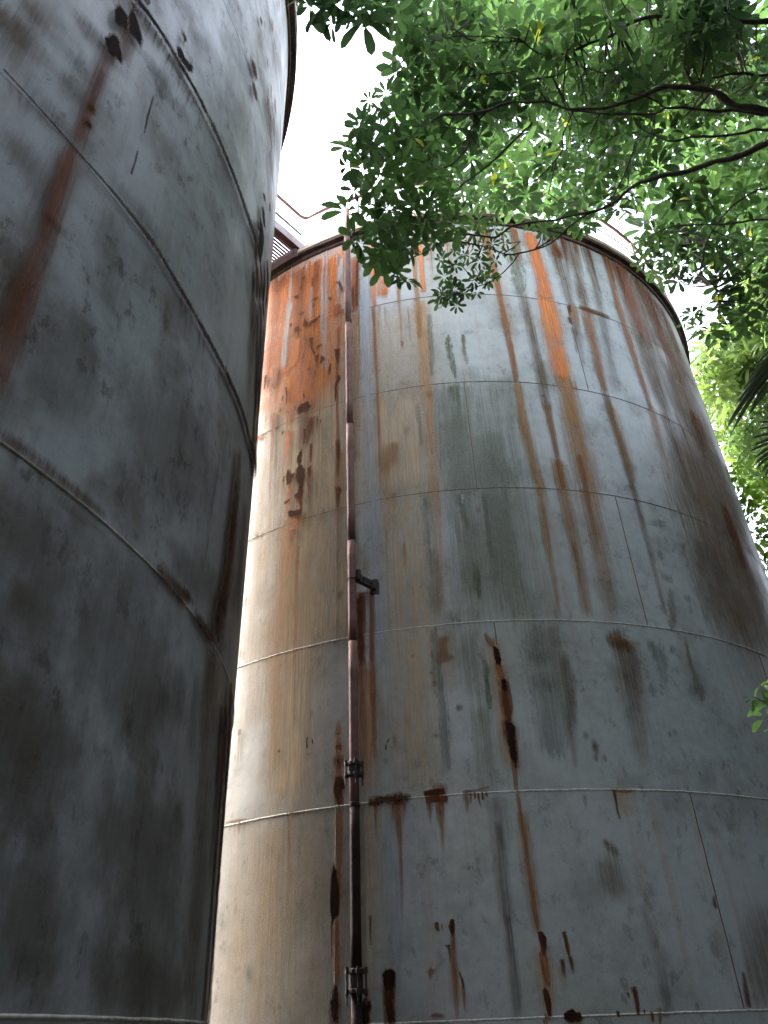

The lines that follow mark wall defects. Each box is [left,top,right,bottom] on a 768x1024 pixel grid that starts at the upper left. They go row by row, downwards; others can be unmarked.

rust [0,0,400,865]
rust [413,234,434,455]
rust [480,224,718,596]
rust [207,684,245,1024]
rust [329,721,345,1024]
rust [362,968,396,1024]
rust [368,792,411,867]
rust [424,785,448,828]
rust [434,919,465,999]
rust [517,791,573,1024]